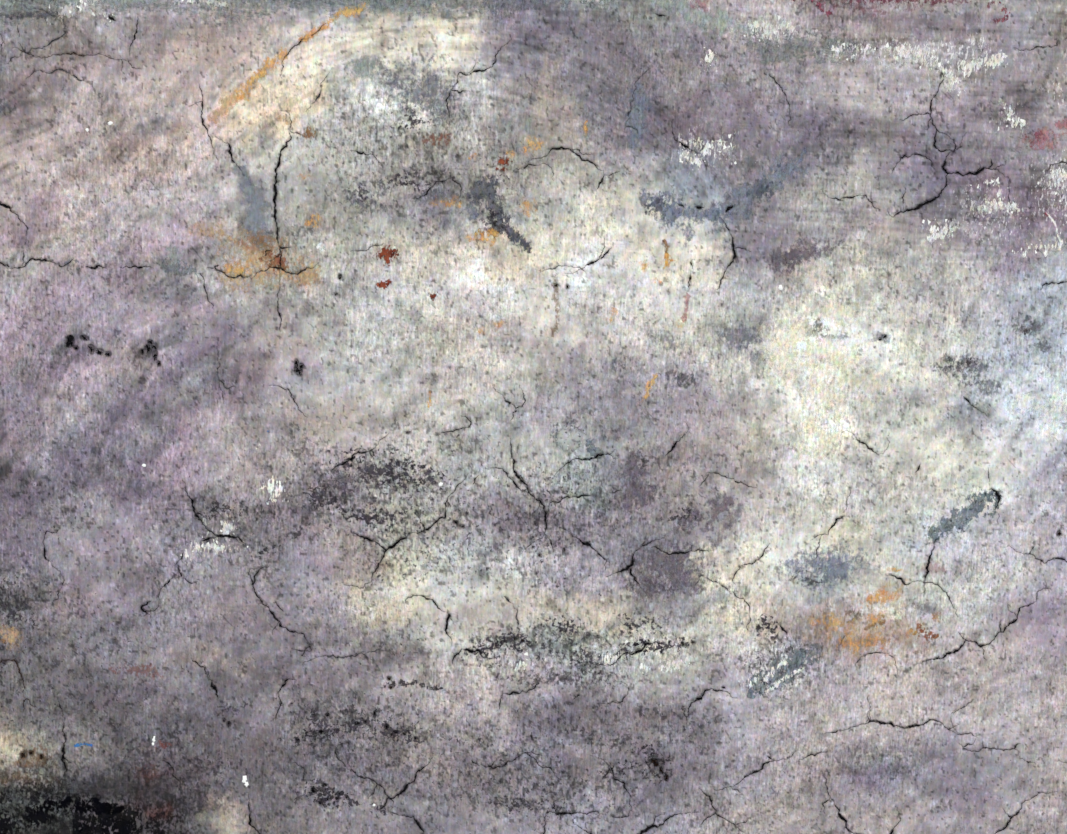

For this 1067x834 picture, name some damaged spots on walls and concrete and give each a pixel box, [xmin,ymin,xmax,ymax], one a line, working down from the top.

corrosion [300,6,364,42]
corrosion [208,47,287,124]
crack [821,70,1011,216]
corrosion [189,223,318,291]
crack [200,110,320,329]
corrosion [376,245,399,266]
crack [347,387,770,630]
corrosion [0,597,38,643]
crack [141,480,385,716]
corrosion [818,591,939,654]
crack [887,540,1067,662]
crack [543,697,1032,834]